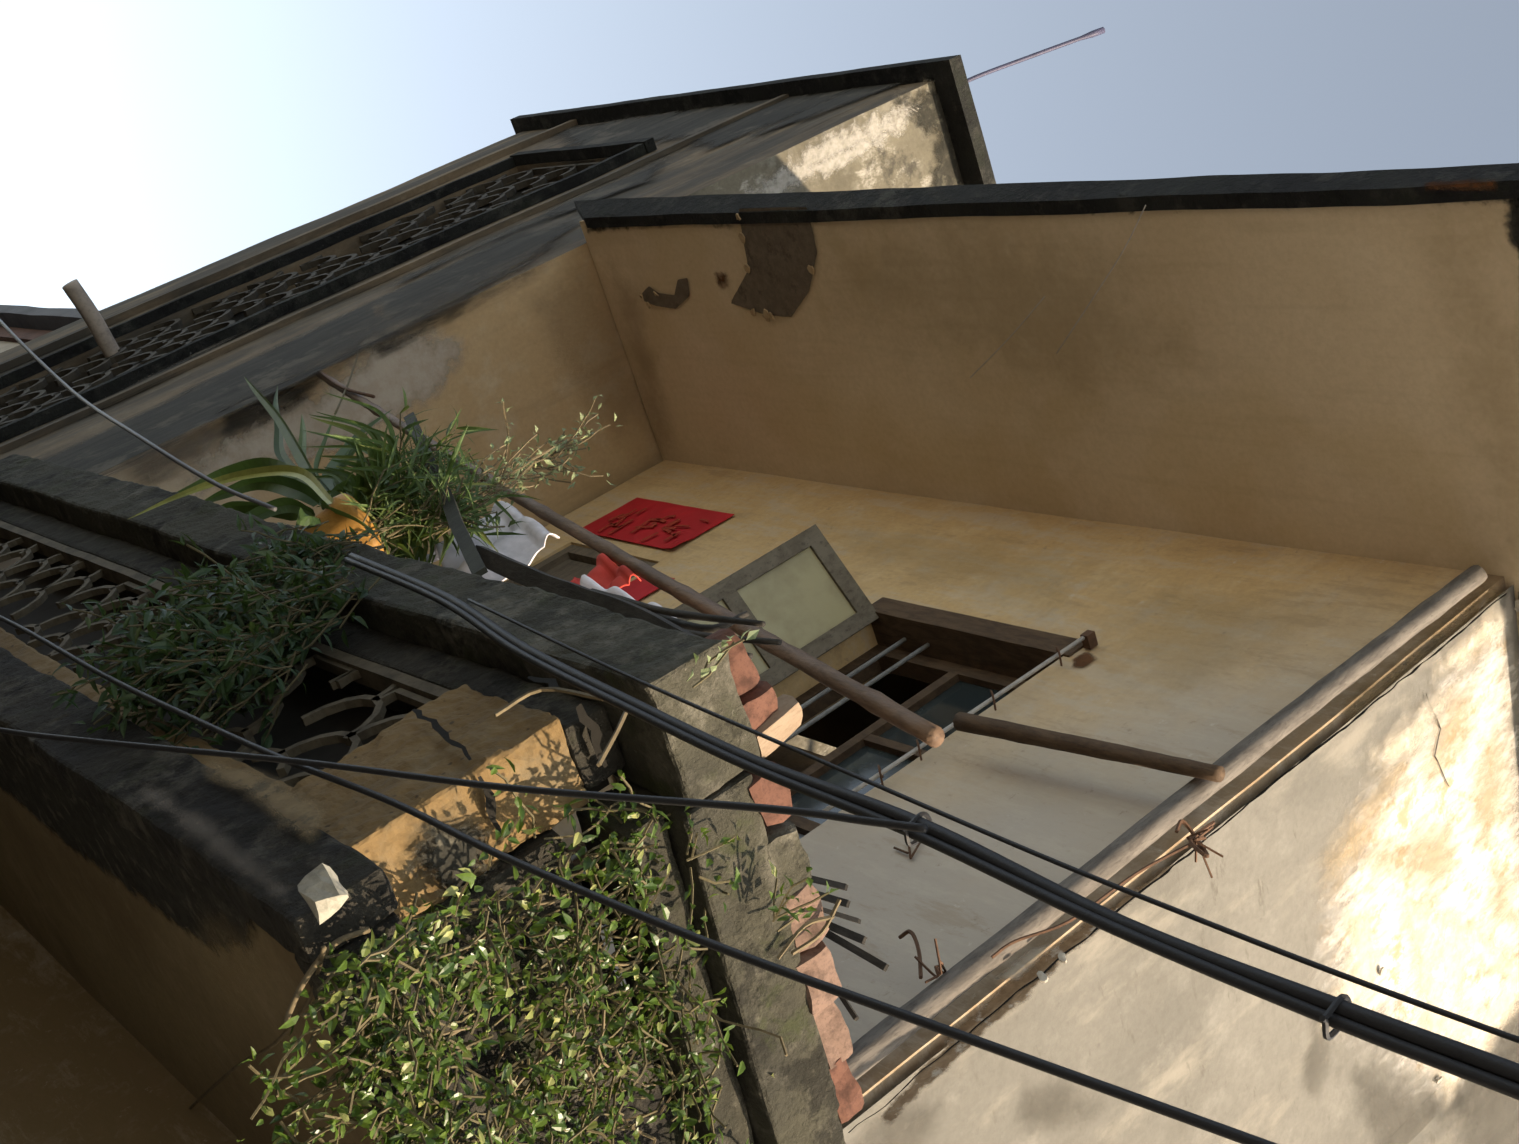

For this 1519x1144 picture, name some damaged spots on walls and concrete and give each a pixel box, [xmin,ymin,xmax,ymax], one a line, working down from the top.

leakage [43,79,964,479]
spalling [639,278,690,309]
spalling [732,207,817,322]
leakage [1487,198,1519,249]
crack [412,709,503,837]
crack [848,594,1506,1133]
leakage [1469,1089,1519,1144]